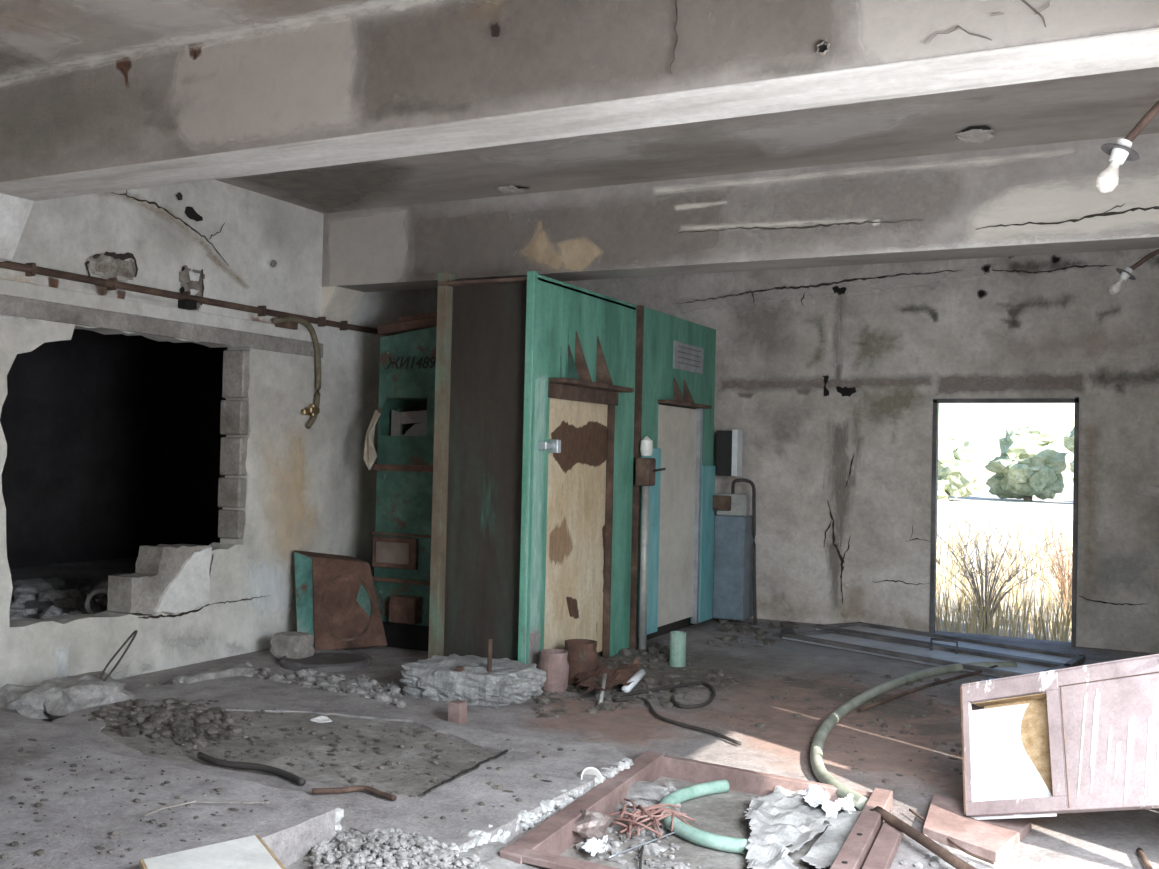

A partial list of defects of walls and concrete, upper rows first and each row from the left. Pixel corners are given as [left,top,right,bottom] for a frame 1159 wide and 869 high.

rust [188,42,202,60]
crack [670,0,678,75]
crack [924,0,1050,44]
rust [116,56,132,88]
crack [112,190,229,266]
crack [976,204,1159,230]
spalling [85,251,138,282]
crack [992,265,1113,274]
crack [677,270,962,306]
crack [824,454,855,603]
crack [138,595,270,619]